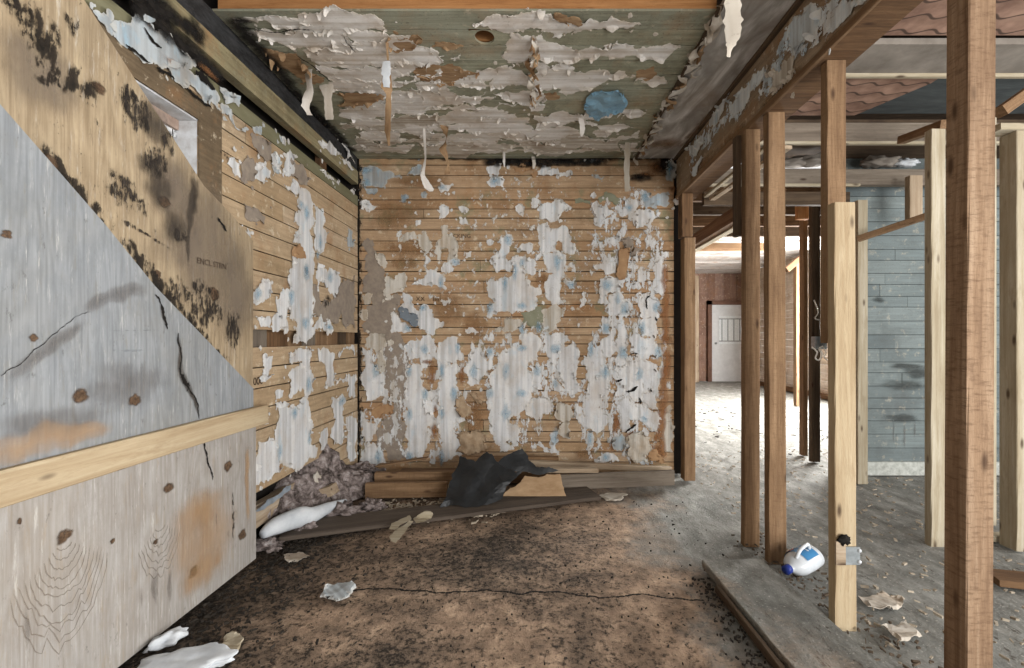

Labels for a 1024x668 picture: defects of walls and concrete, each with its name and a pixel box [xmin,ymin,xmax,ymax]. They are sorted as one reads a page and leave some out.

water stain [3,0,97,104]
water stain [42,84,249,358]
peeling [89,0,866,490]
crack [3,312,87,375]
crack [156,295,199,415]
water stain [178,341,198,408]
crack [353,588,704,601]